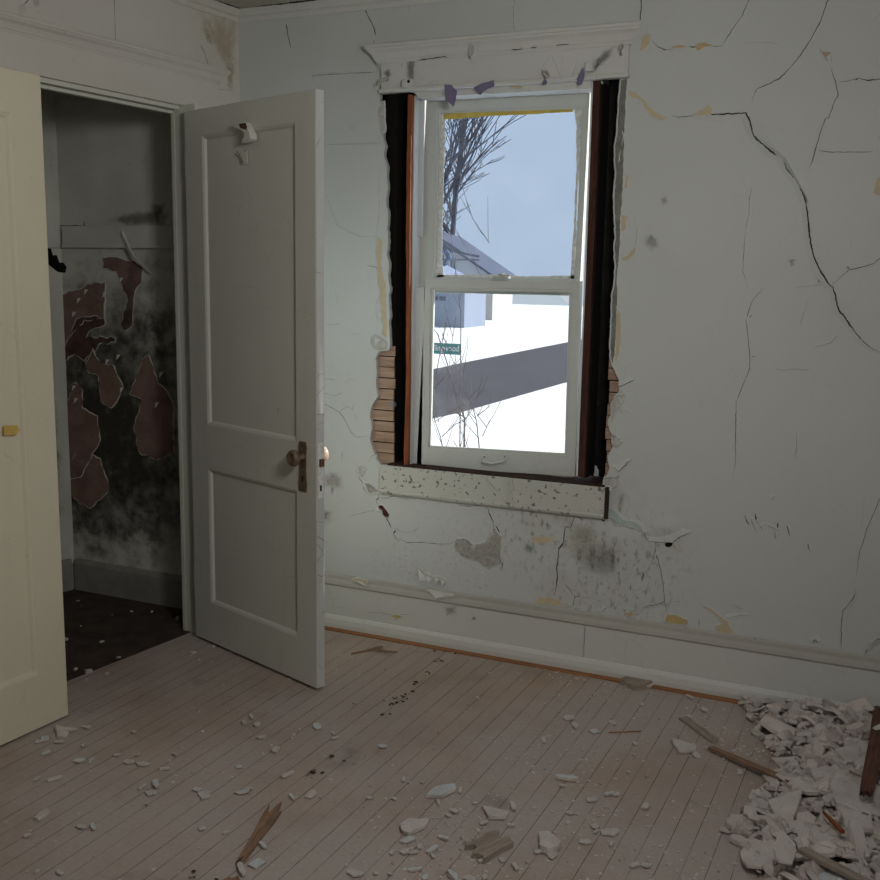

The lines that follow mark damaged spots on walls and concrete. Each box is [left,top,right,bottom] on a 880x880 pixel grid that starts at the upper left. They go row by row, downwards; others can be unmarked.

flaking render [378,100,387,135]
flaking render [609,79,668,365]
crack [671,0,880,354]
peeling [63,256,144,345]
flaking render [369,235,389,351]
crack [733,185,765,478]
peeling [67,382,109,509]
damp [65,311,180,552]
peeling [85,349,175,460]
crack [553,516,590,606]
crack [614,509,691,614]
crack [841,499,880,650]